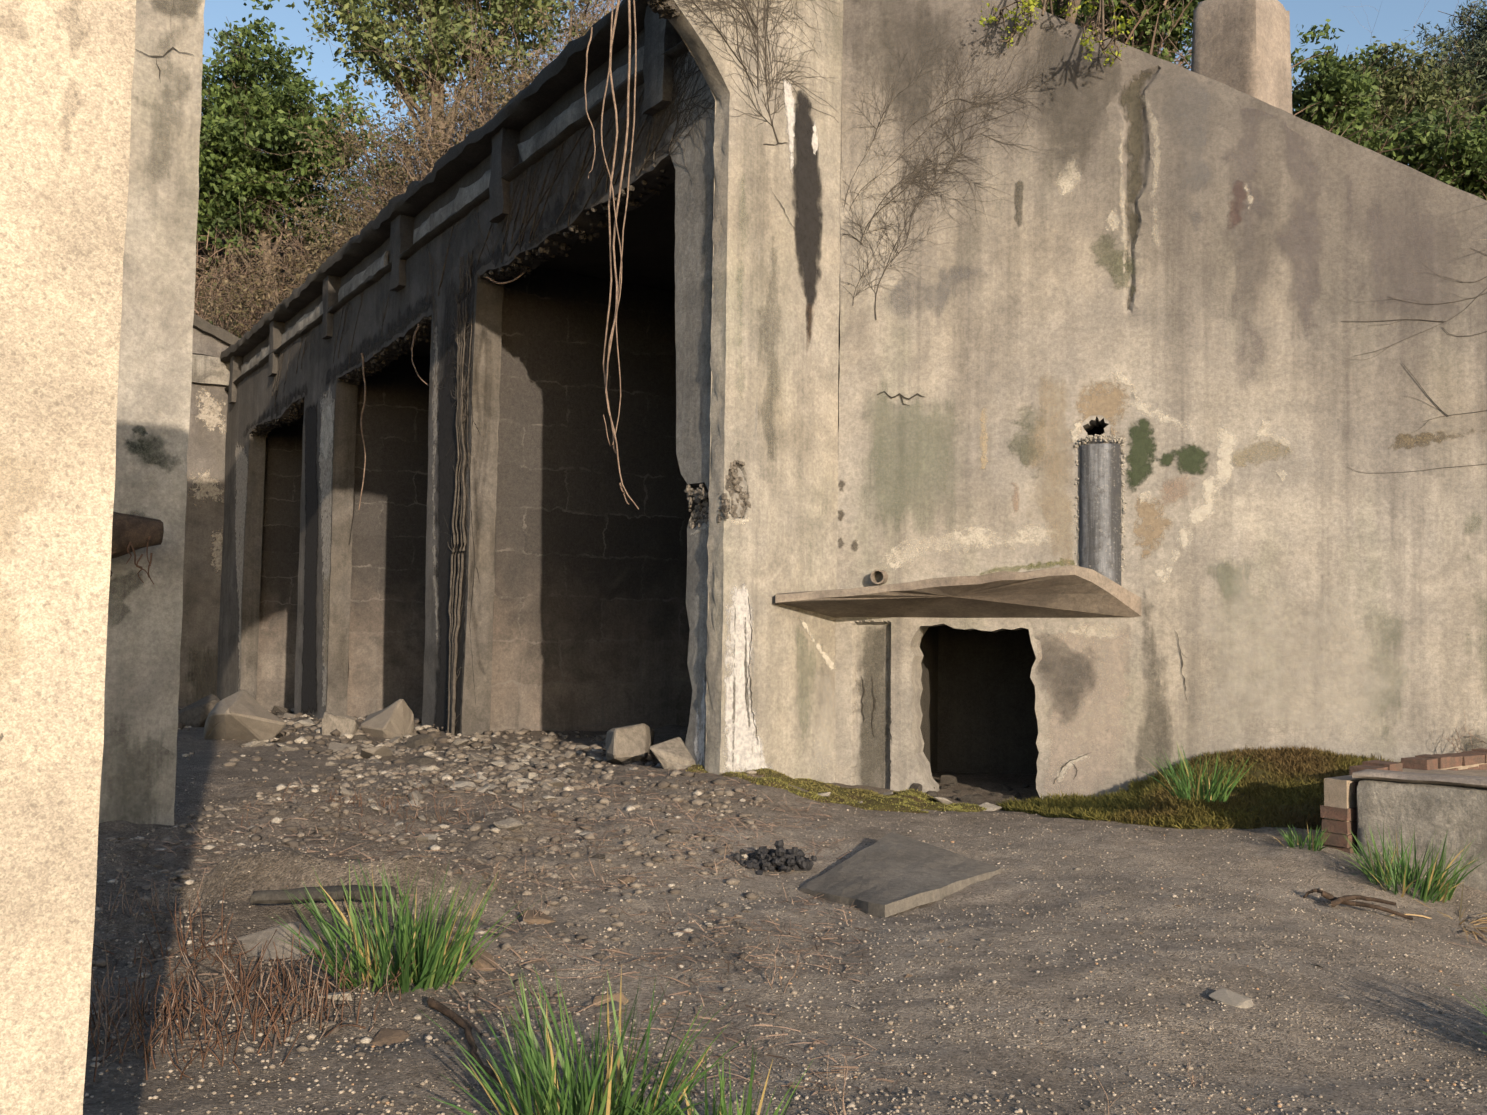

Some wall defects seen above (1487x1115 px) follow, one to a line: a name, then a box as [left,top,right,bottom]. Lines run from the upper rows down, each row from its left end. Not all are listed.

damp [784,81,823,335]
damp [126,427,174,467]
peeling [189,387,335,707]
peeling [432,326,440,640]
spalling [684,460,751,536]
spalling [1071,371,1140,442]